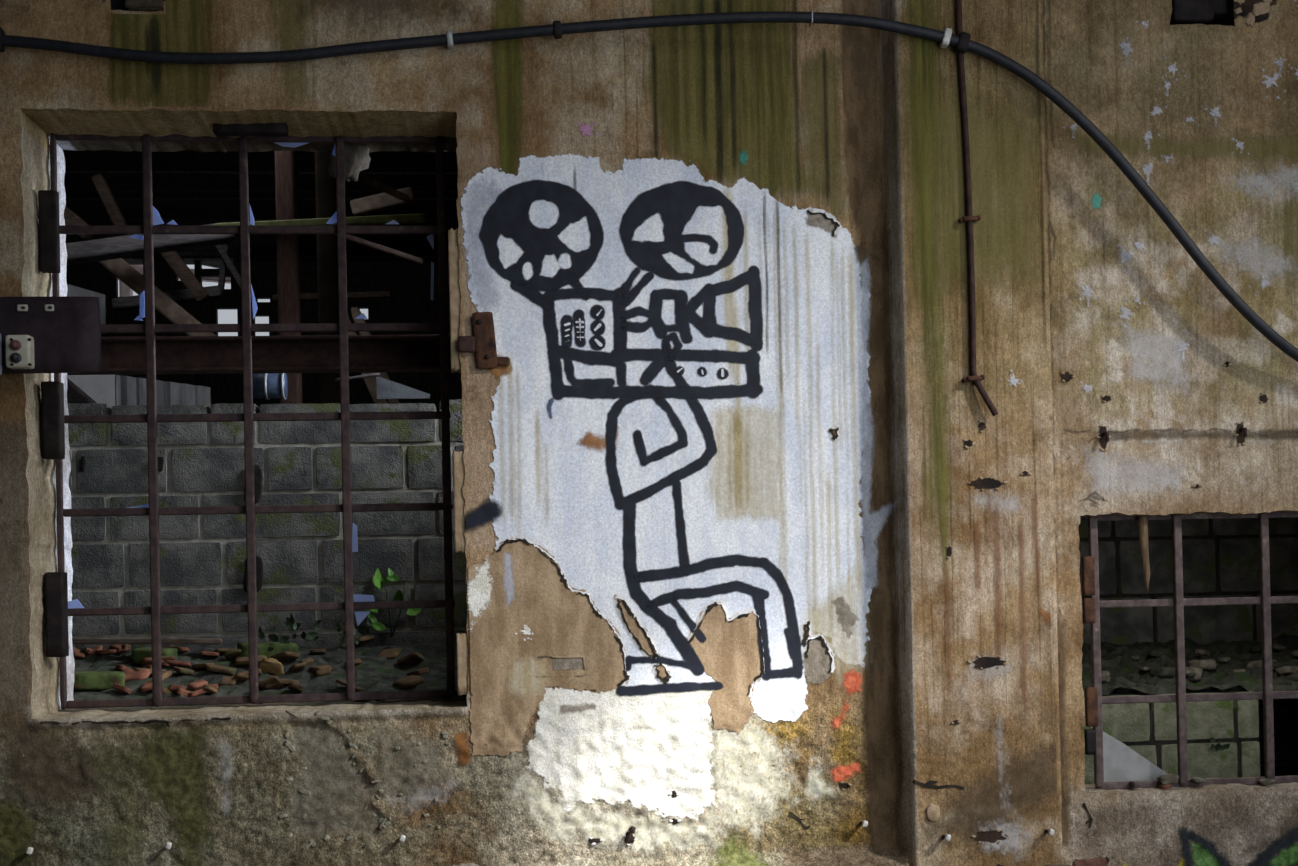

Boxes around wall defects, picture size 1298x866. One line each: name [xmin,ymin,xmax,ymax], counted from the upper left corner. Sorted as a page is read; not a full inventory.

spalling [1233,0,1277,27]
leakage [703,0,736,178]
rust [490,355,512,377]
spalling [968,471,1032,490]
peeling [468,535,673,757]
peeling [686,599,765,735]
spalling [967,655,1008,669]
leakage [3,719,88,802]